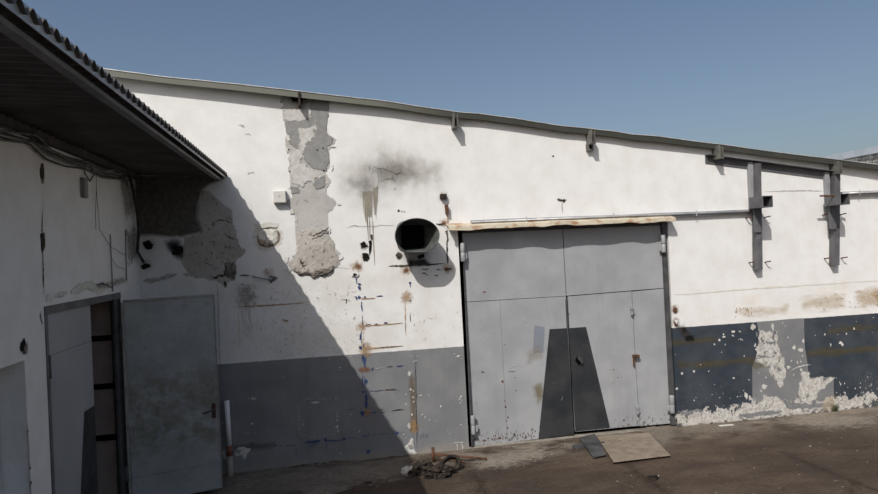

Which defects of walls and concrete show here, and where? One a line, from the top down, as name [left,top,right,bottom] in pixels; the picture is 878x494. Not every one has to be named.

spalling [141,191,245,288]
spalling [268,91,343,283]
water stain [363,187,378,265]
corrosion [359,293,411,333]
peeling [674,318,878,426]